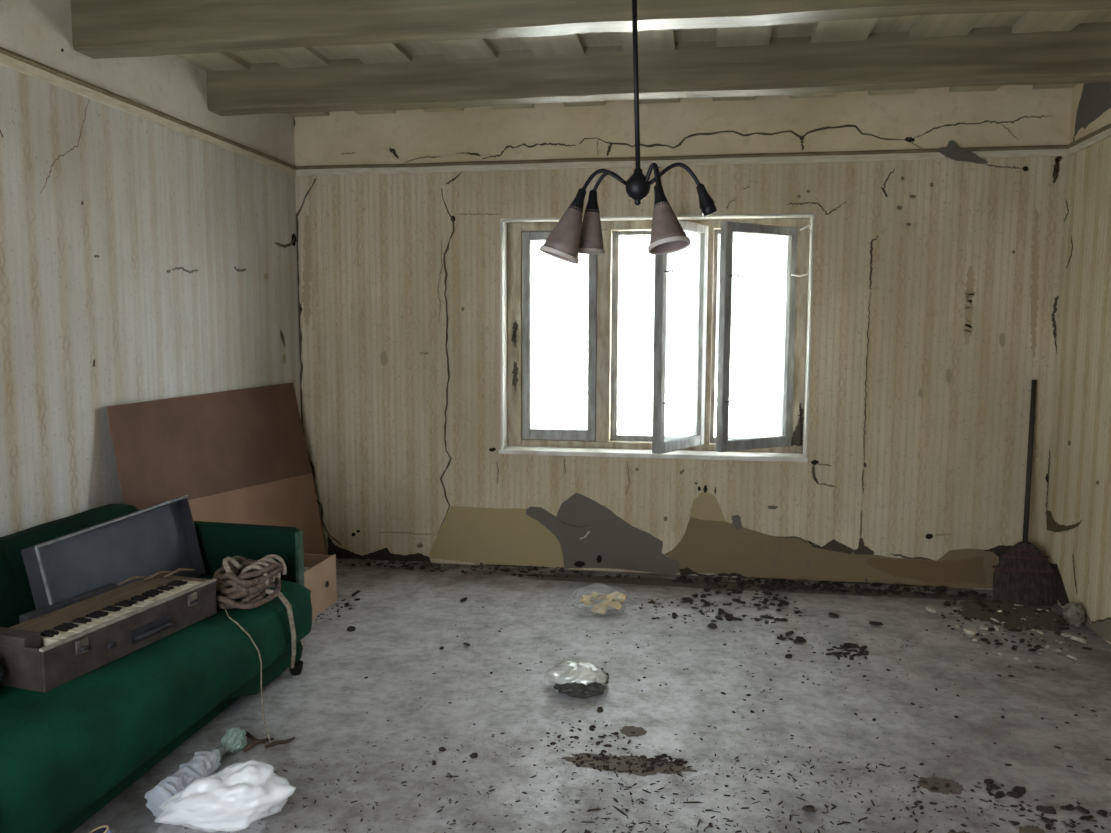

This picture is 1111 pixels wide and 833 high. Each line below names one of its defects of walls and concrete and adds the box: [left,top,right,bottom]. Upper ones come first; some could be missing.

crack [40,99,89,193]
flaking render [1075,82,1111,136]
crack [296,178,341,545]
crack [379,115,1048,540]
flaking render [429,493,1012,589]